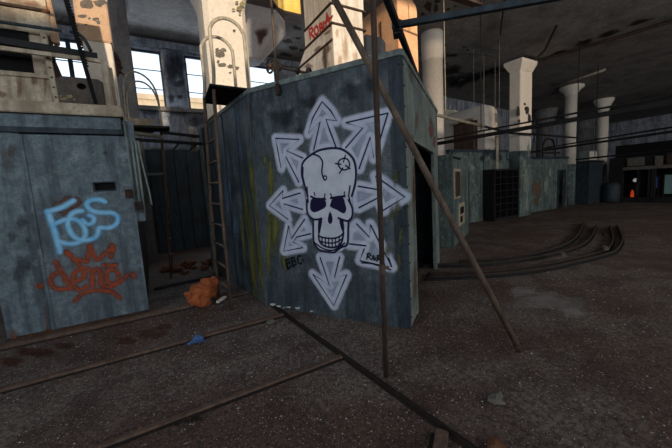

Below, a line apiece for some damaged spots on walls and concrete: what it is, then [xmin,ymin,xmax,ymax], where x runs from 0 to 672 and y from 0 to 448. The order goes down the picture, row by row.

peeling [78,0,108,26]
peeling [215,48,239,74]
water stain [241,162,286,296]